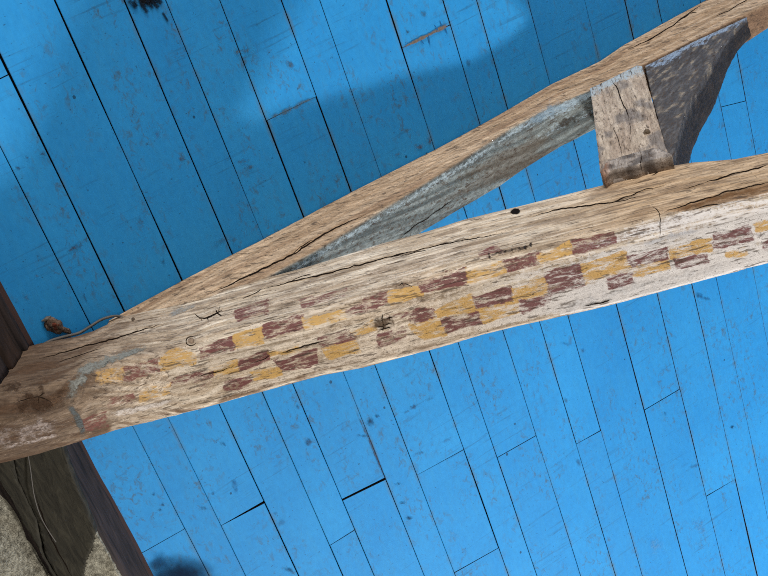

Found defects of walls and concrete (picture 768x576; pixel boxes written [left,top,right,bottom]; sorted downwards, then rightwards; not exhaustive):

peeling [406,21,447,46]
crack [689,165,765,188]
crack [195,202,507,320]
crack [42,323,164,363]